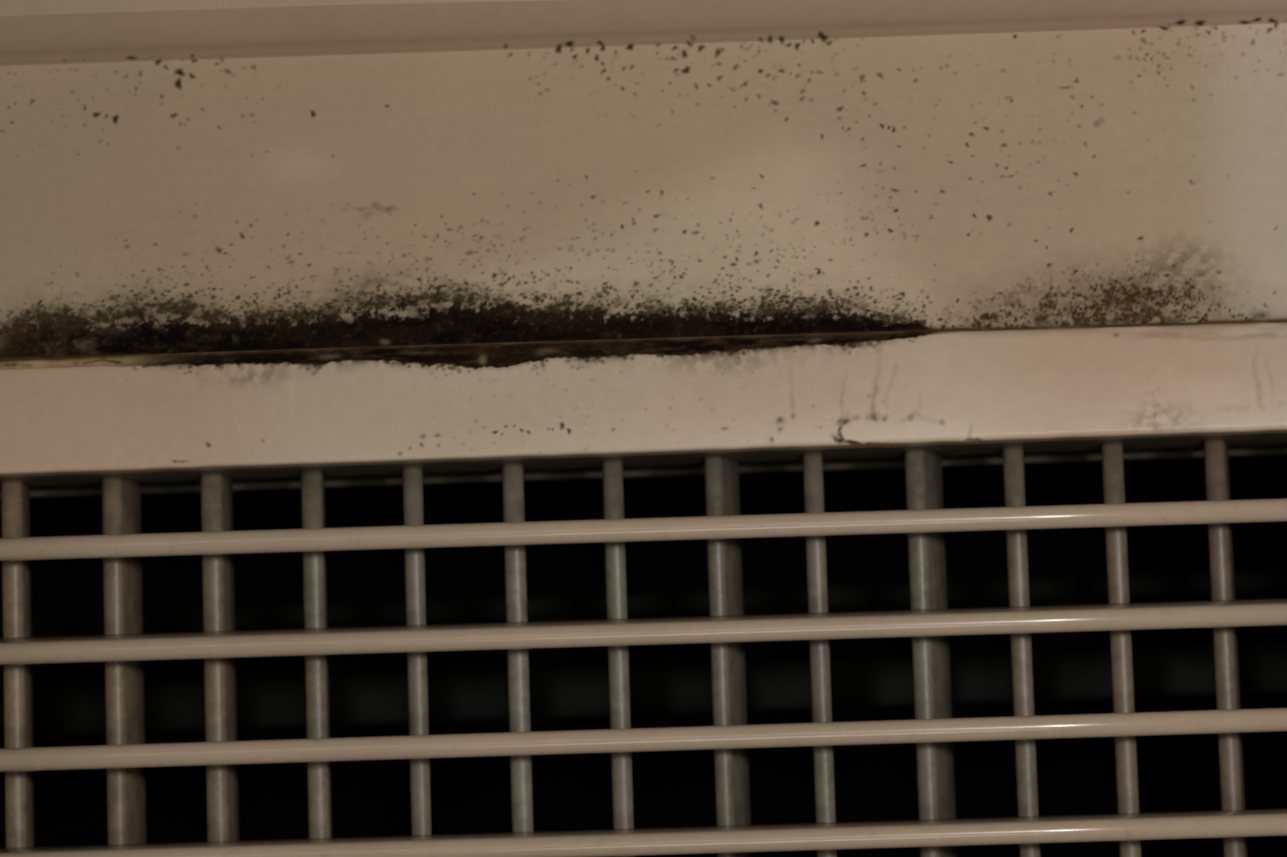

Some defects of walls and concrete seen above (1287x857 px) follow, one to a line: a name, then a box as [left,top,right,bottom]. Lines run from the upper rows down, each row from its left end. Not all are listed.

damp [0,258,1263,369]